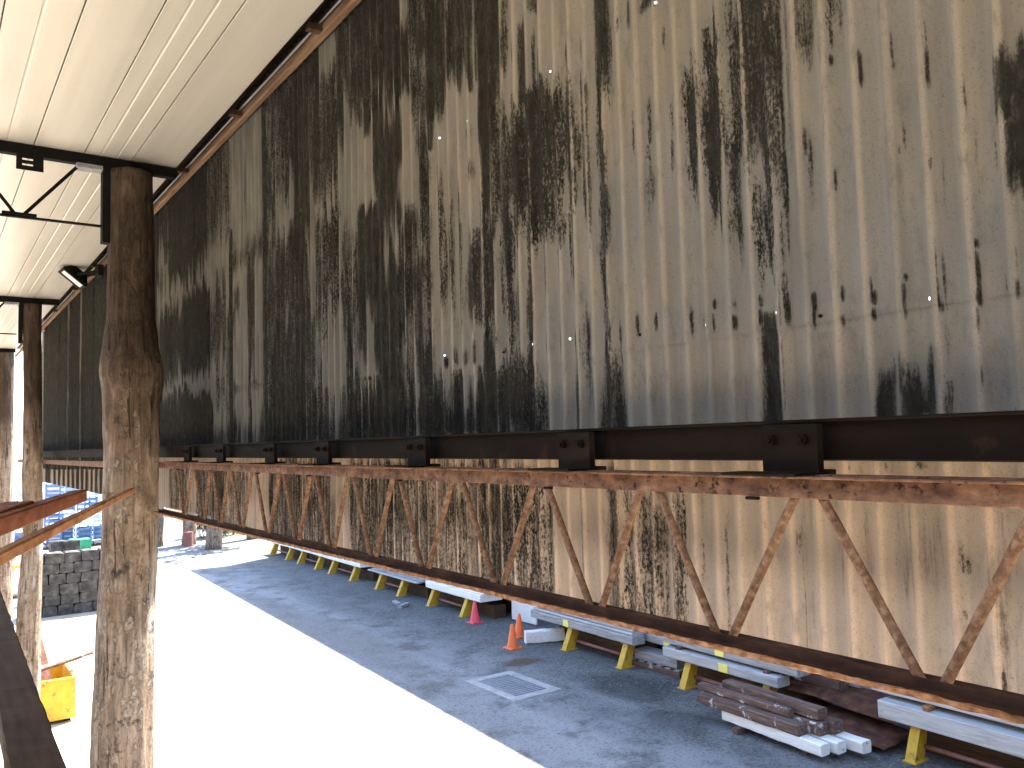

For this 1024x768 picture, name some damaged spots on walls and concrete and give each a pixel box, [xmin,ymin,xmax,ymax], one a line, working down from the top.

leakage [826,0,843,66]
leakage [992,32,1024,197]
leakage [154,0,651,446]
leakage [670,0,814,421]
leakage [974,239,982,329]
leakage [43,265,107,494]
leakage [875,347,953,416]
leakage [269,458,335,544]
leakage [349,459,555,593]
leakage [607,489,688,622]
rust [505,658,540,667]
rust [780,678,910,750]